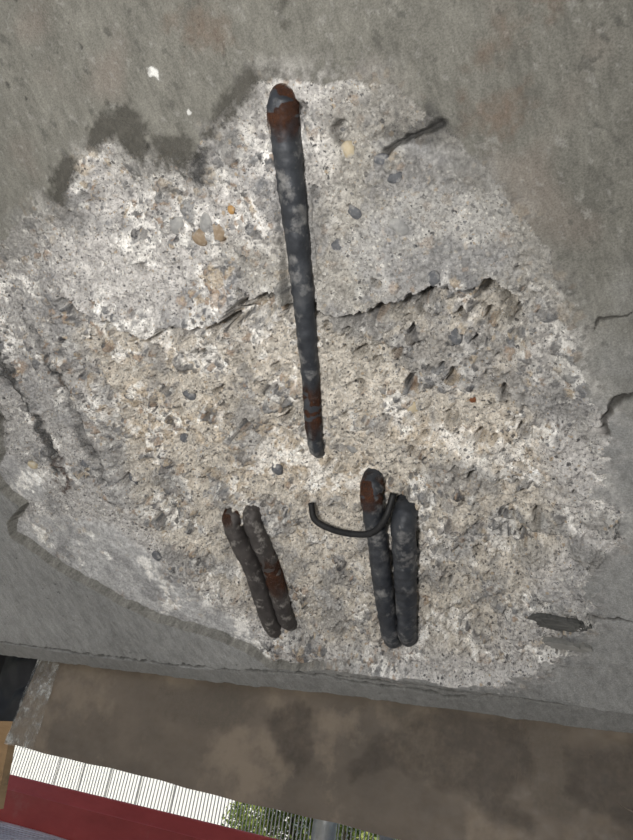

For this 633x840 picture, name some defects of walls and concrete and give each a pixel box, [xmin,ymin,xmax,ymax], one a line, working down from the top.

damp [202,65,260,138]
rust [267,83,300,131]
damp [87,102,199,177]
crack [380,115,449,158]
damp [48,157,77,207]
crack [595,312,632,329]
spalling [0,76,626,688]
rust [302,385,322,434]
crack [596,392,633,439]
rust [360,478,384,511]
rust [260,559,287,595]